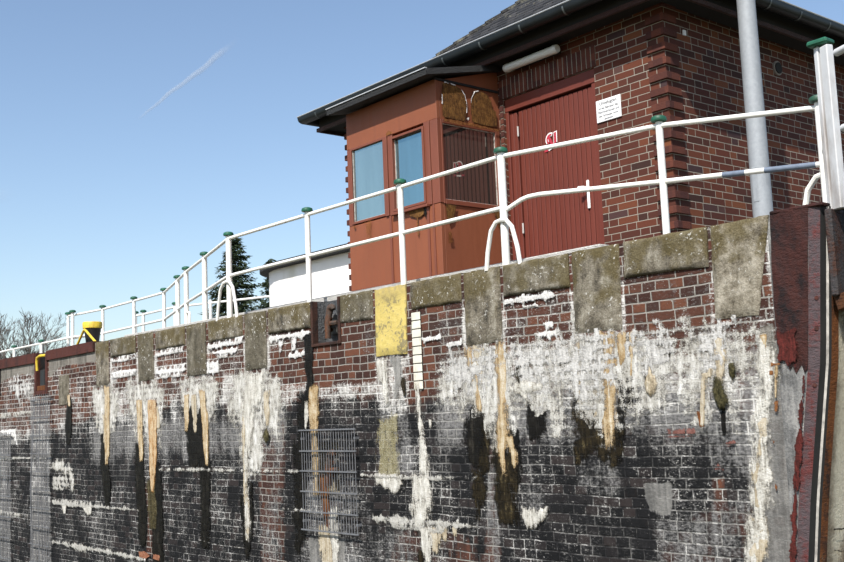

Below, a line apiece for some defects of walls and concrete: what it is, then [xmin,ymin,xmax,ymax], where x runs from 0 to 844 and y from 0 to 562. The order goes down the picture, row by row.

water stain [51,459,75,491]
water stain [100,433,110,509]
water stain [135,442,164,562]
water stain [184,406,211,551]
water stain [240,368,270,560]
water stain [372,319,678,562]
water stain [503,290,555,308]
water stain [689,315,741,371]
water stain [744,334,778,562]
corrosion [769,362,780,412]